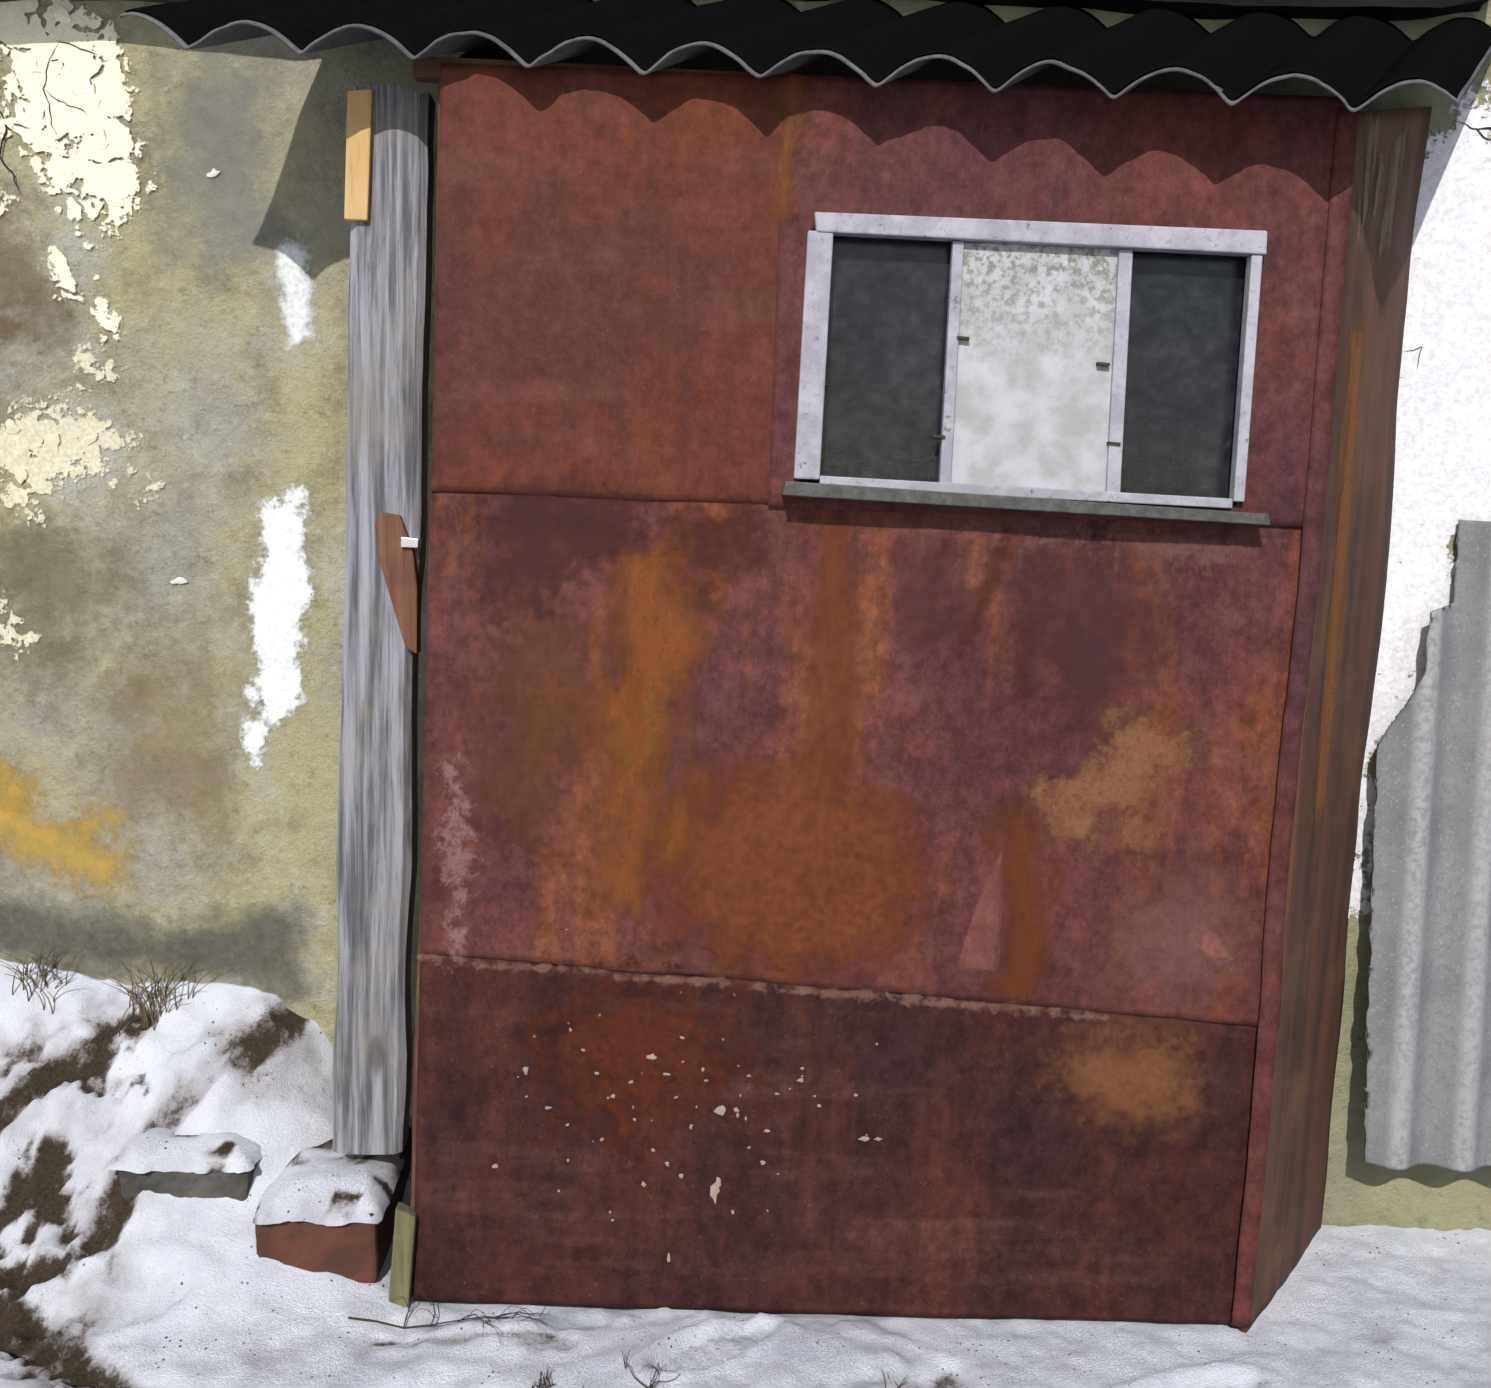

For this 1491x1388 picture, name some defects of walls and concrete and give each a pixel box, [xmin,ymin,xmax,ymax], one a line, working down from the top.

flaking render [0,0,157,250]
crack [1454,120,1491,140]
flaking render [0,591,42,661]
flaking render [0,246,166,528]
peeling [241,717,269,770]
rust [1315,331,1362,816]
peeling [1348,79,1491,919]
rust [522,956,754,1152]